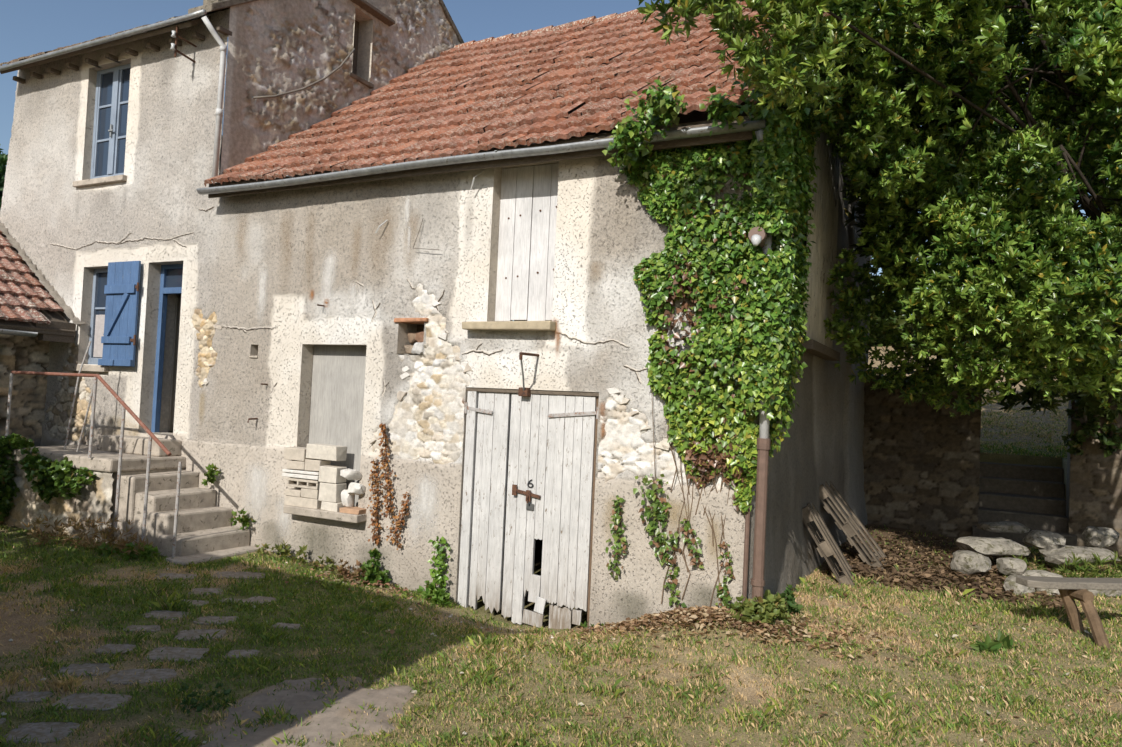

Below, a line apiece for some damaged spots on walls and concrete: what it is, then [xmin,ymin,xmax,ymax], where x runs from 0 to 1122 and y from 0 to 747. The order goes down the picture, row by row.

crack [50,206,214,250]
flaking render [45,343,92,445]
flaking render [192,309,222,388]
flaking render [369,283,473,464]
crack [556,331,647,384]
flaking render [597,387,688,488]
flaking render [706,473,732,490]